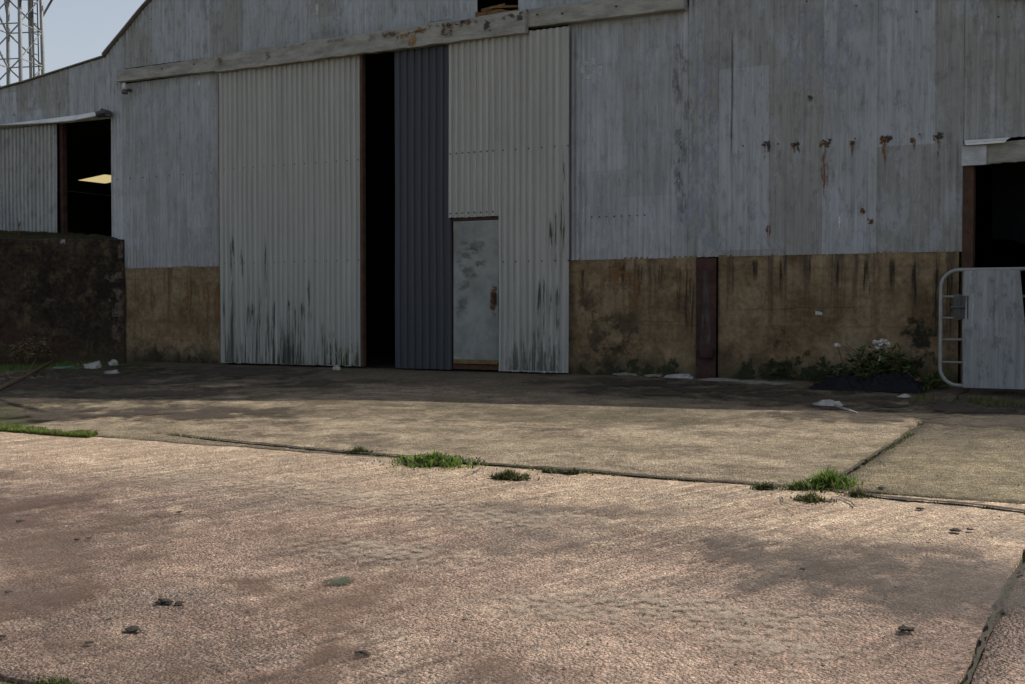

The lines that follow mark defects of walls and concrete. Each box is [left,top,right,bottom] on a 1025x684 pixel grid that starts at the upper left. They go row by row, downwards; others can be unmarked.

rust [820,139,832,193]
rust [880,135,893,160]
damp [135,290,325,365]
damp [510,282,559,371]
damp [934,267,952,327]